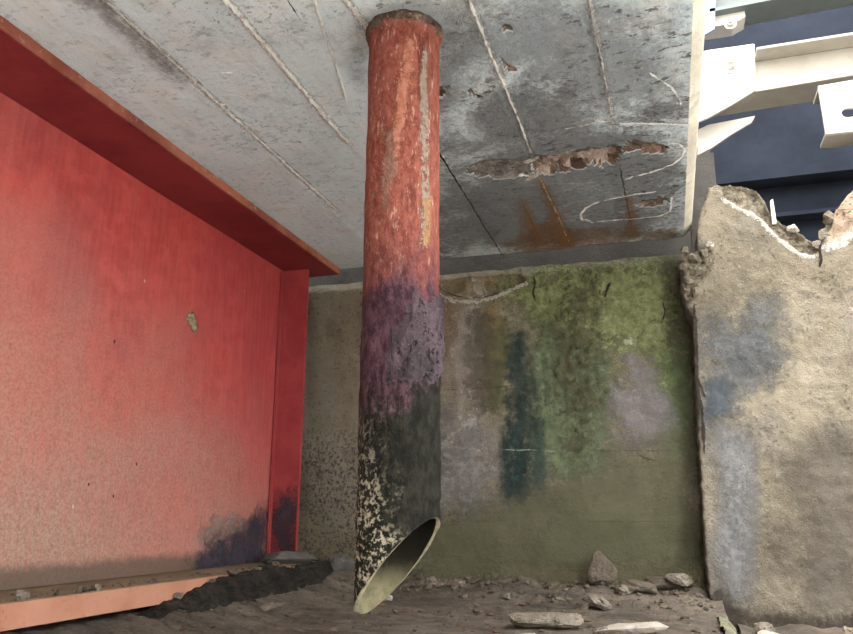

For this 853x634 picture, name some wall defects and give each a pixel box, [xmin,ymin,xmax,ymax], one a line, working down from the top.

peeling [186,312,198,332]
damp [86,0,352,211]
peeling [392,37,431,249]
spalling [530,141,669,175]
spalling [715,185,853,256]
damp [409,275,703,582]
damp [697,293,853,628]